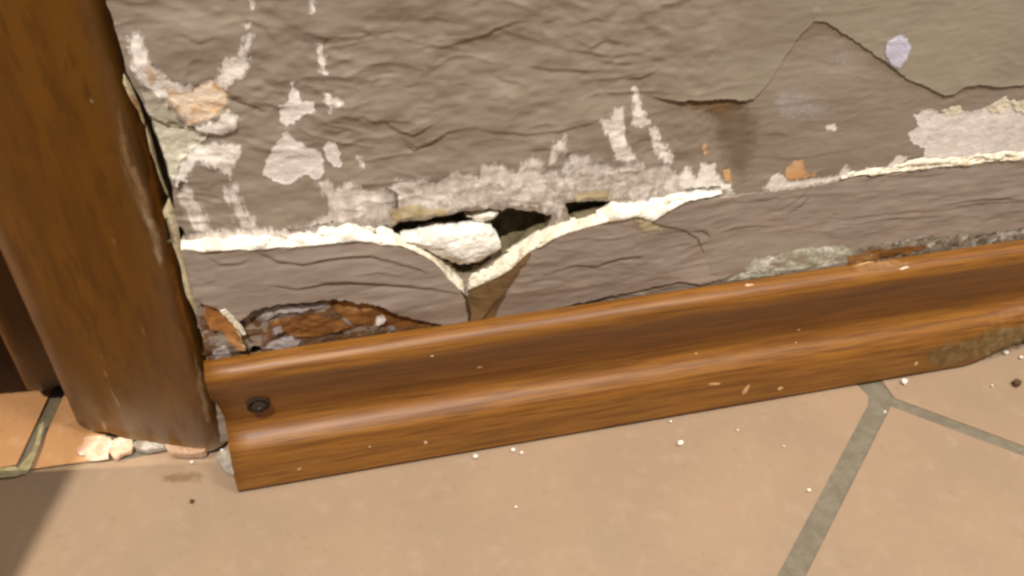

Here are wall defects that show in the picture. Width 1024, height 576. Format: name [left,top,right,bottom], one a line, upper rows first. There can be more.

peeling [126,0,1024,246]
spalling [196,299,441,360]